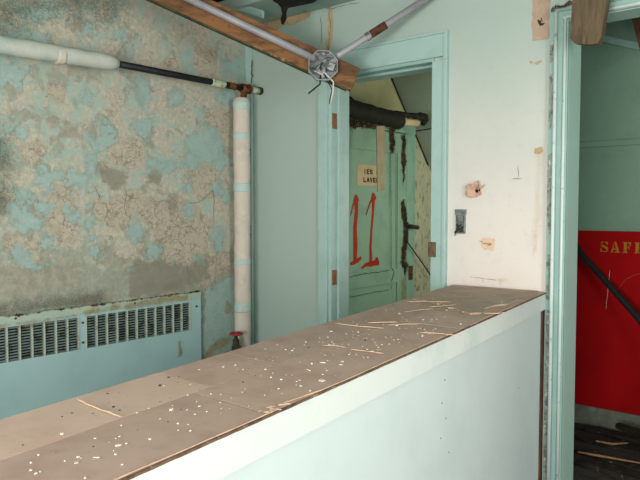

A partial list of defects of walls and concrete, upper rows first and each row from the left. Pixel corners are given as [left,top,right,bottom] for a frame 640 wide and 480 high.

peeling [159,41,220,109]
peeling [205,88,237,153]
corrosion [349,118,380,130]
corrosion [387,127,399,153]
flaking render [465,181,484,198]
peeling [2,162,164,272]
flaking render [480,238,495,251]
corrosion [0,290,200,330]